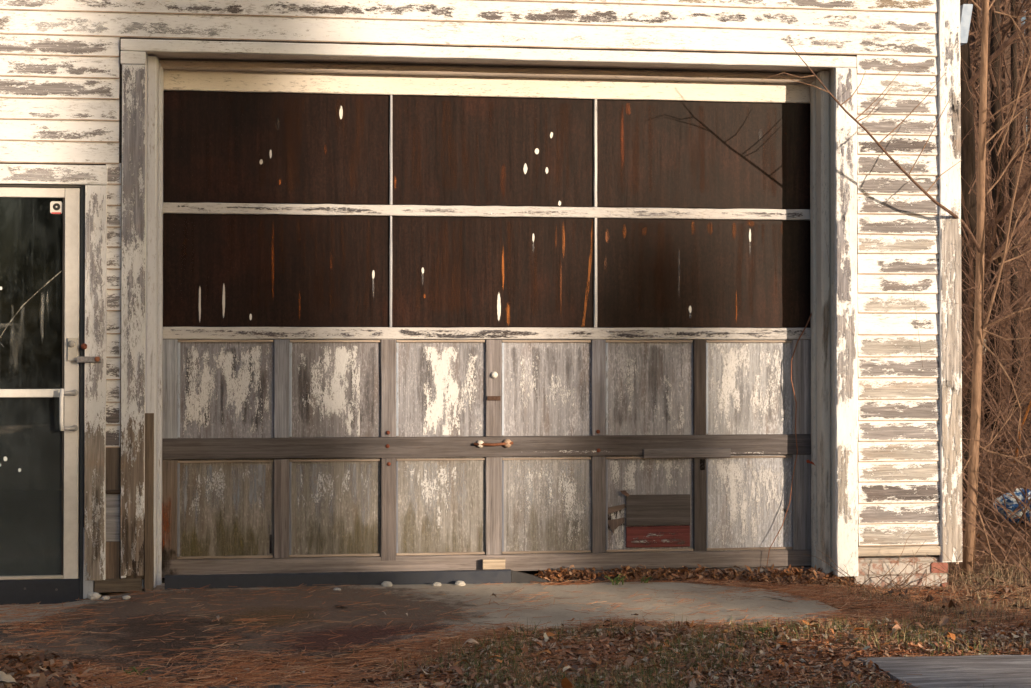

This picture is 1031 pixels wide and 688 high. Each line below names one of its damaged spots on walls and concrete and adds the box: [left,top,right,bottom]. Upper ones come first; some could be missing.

peeling [121,22,227,37]
peeling [161,4,243,13]
peeling [265,1,455,17]
peeling [178,205,381,214]
peeling [0,0,145,581]
peeling [478,0,963,561]
peeling [171,284,382,436]
peeling [399,293,547,435]
peeling [297,470,375,508]
peeling [404,465,456,528]